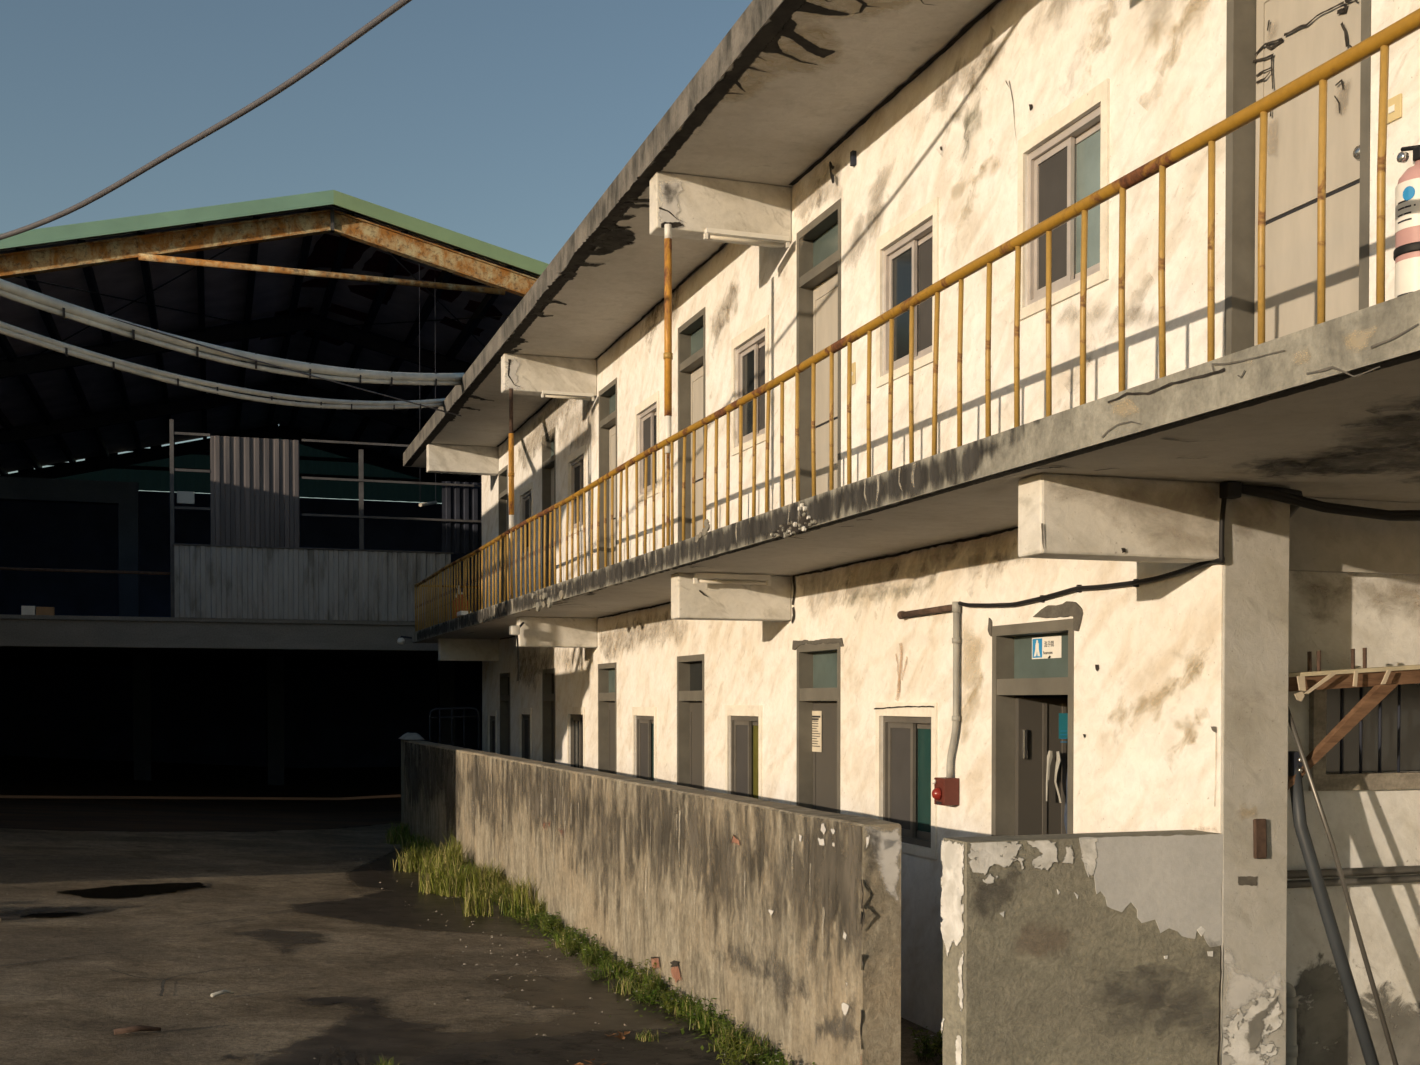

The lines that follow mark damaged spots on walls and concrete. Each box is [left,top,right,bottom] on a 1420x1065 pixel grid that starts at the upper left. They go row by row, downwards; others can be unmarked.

damp [404,0,875,466]
damp [415,352,1420,643]
damp [600,615,677,657]
damp [235,929,323,954]
damp [289,848,553,939]
damp [404,742,901,975]
damp [816,1007,854,1041]
peeling [941,834,1420,1065]